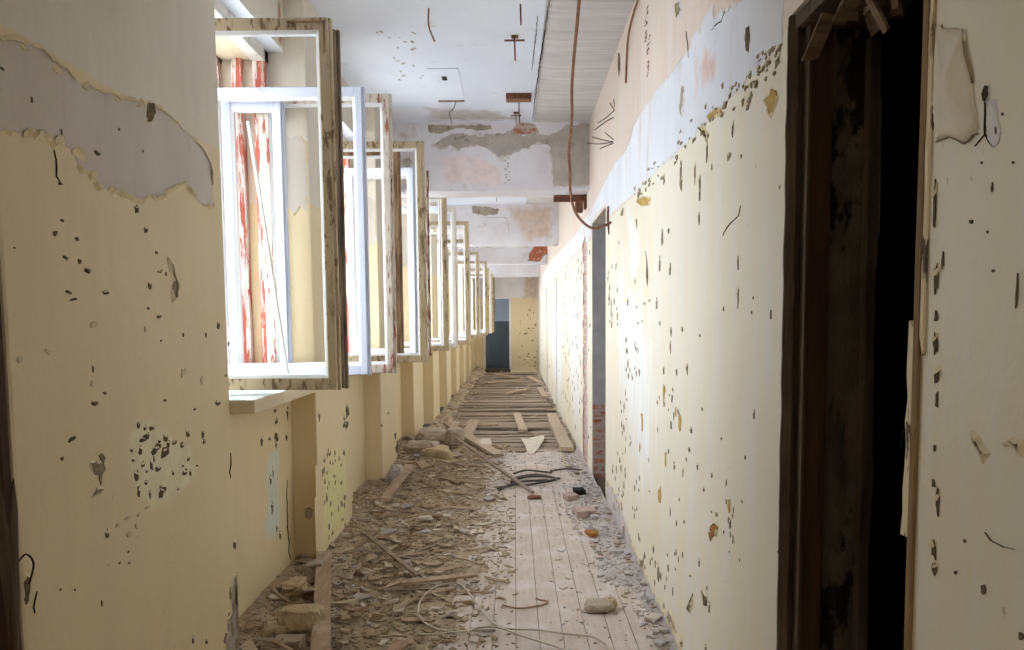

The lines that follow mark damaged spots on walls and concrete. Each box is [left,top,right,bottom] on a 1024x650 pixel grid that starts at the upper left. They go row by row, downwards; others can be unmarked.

peeling [0,34,215,213]
peeling [428,0,784,650]
spalling [105,421,207,564]
spalling [304,448,346,539]
crack [984,532,1015,550]